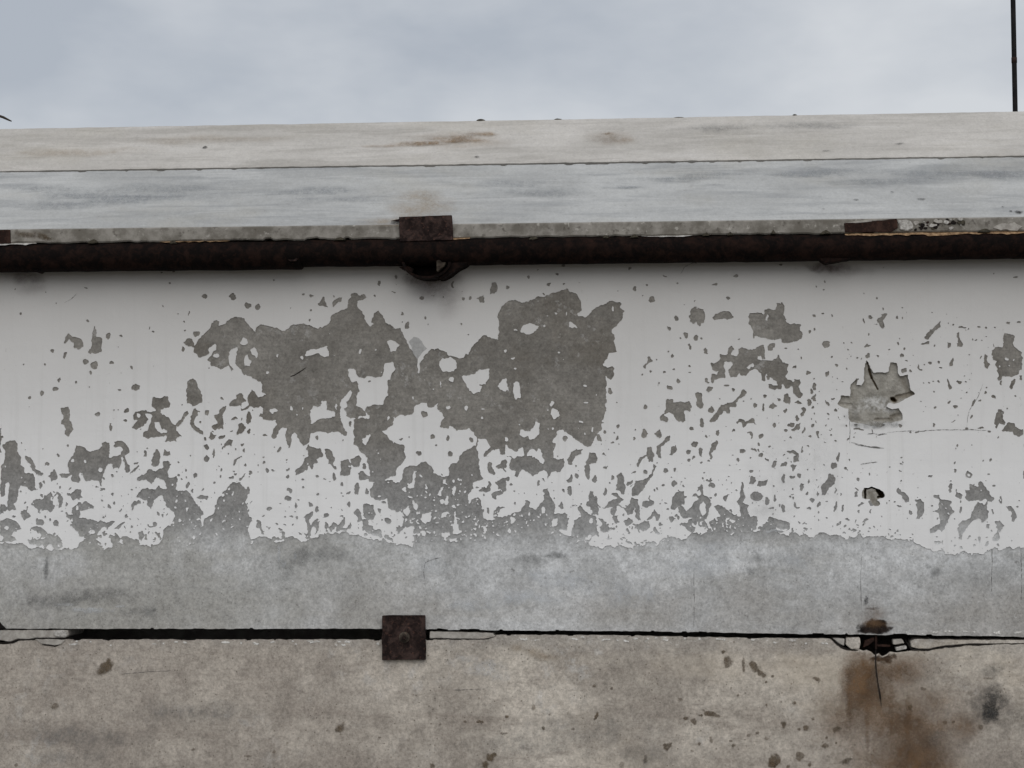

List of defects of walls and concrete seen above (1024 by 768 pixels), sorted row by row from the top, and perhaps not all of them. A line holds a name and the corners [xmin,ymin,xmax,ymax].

peeling [0,264,1023,551]
corrosion [858,619,893,634]
crack [430,633,496,641]
crack [906,641,993,651]
crack [832,639,882,707]